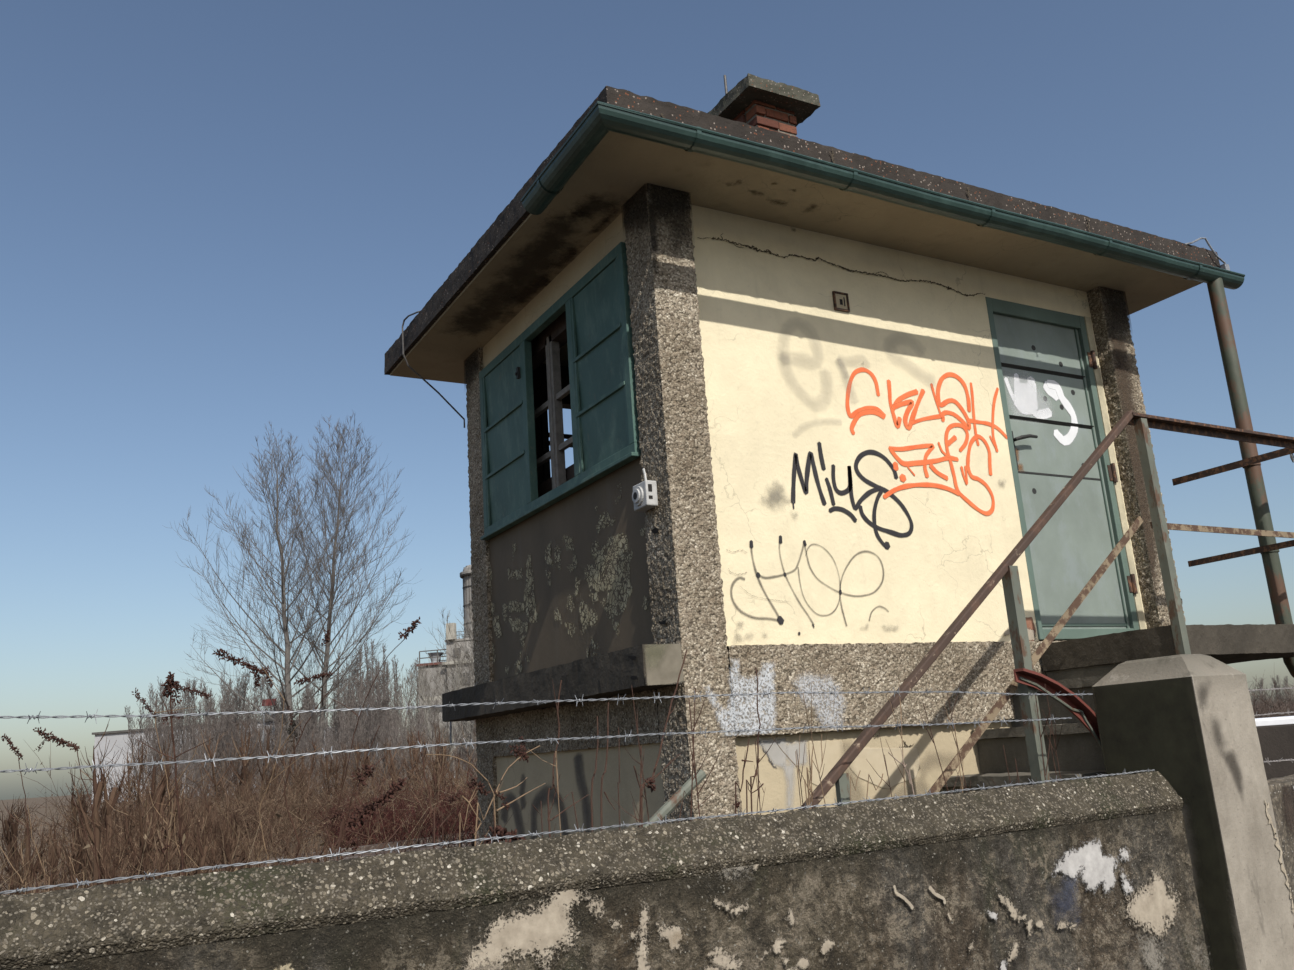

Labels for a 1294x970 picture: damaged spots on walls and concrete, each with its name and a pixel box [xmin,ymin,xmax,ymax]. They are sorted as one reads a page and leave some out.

damp [456,183,690,333]
crack [697,233,985,296]
peeling [489,485,648,675]
flaking render [462,887,687,970]
flaking render [709,895,752,918]
flaking render [720,864,760,879]
flaking render [704,907,835,970]
flaking render [987,893,1079,970]
flaking render [1051,838,1210,970]